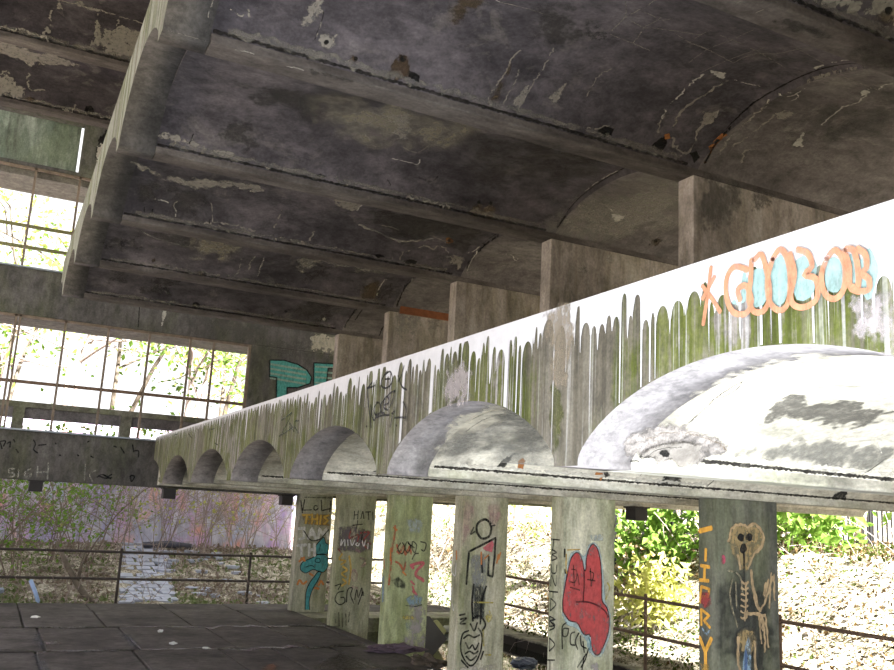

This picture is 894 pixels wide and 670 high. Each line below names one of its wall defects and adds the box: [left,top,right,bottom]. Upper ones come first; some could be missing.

peeling [11,0,143,56]
peeling [303,0,324,26]
peeling [0,41,80,100]
crack [85,0,894,336]
leakage [853,297,891,335]
spalling [624,355,824,467]
leakage [765,395,894,469]